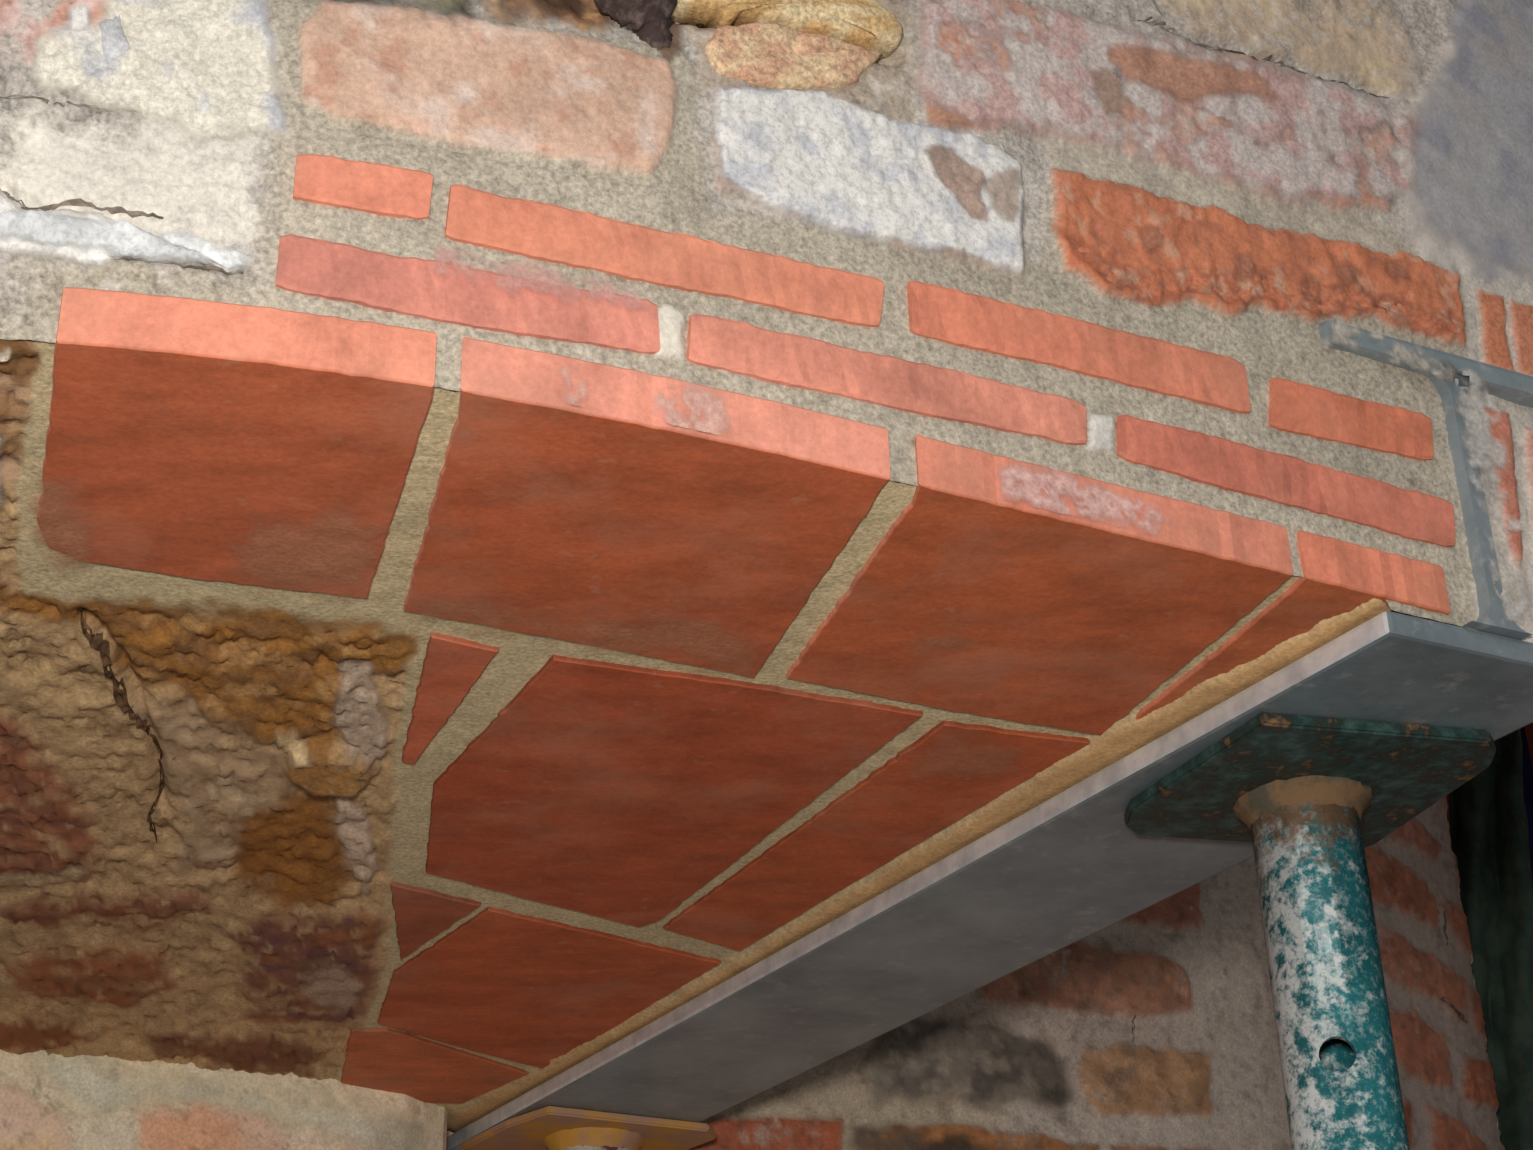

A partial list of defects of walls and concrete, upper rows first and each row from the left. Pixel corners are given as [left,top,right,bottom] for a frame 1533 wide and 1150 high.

crack [1,94,139,113]
crack [0,189,163,219]
peeling [0,193,244,272]
crack [108,255,244,275]
crack [76,608,164,842]